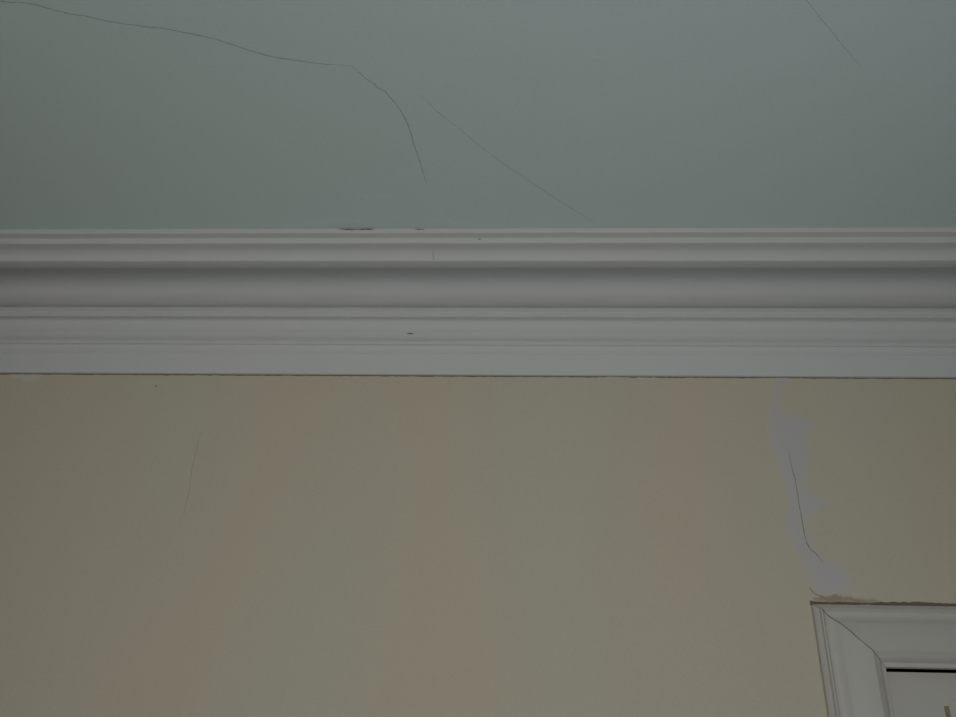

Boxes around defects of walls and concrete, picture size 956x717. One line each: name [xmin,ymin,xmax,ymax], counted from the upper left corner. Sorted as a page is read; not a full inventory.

crack [0,0,427,184]
crack [788,451,822,561]
crack [810,588,956,659]